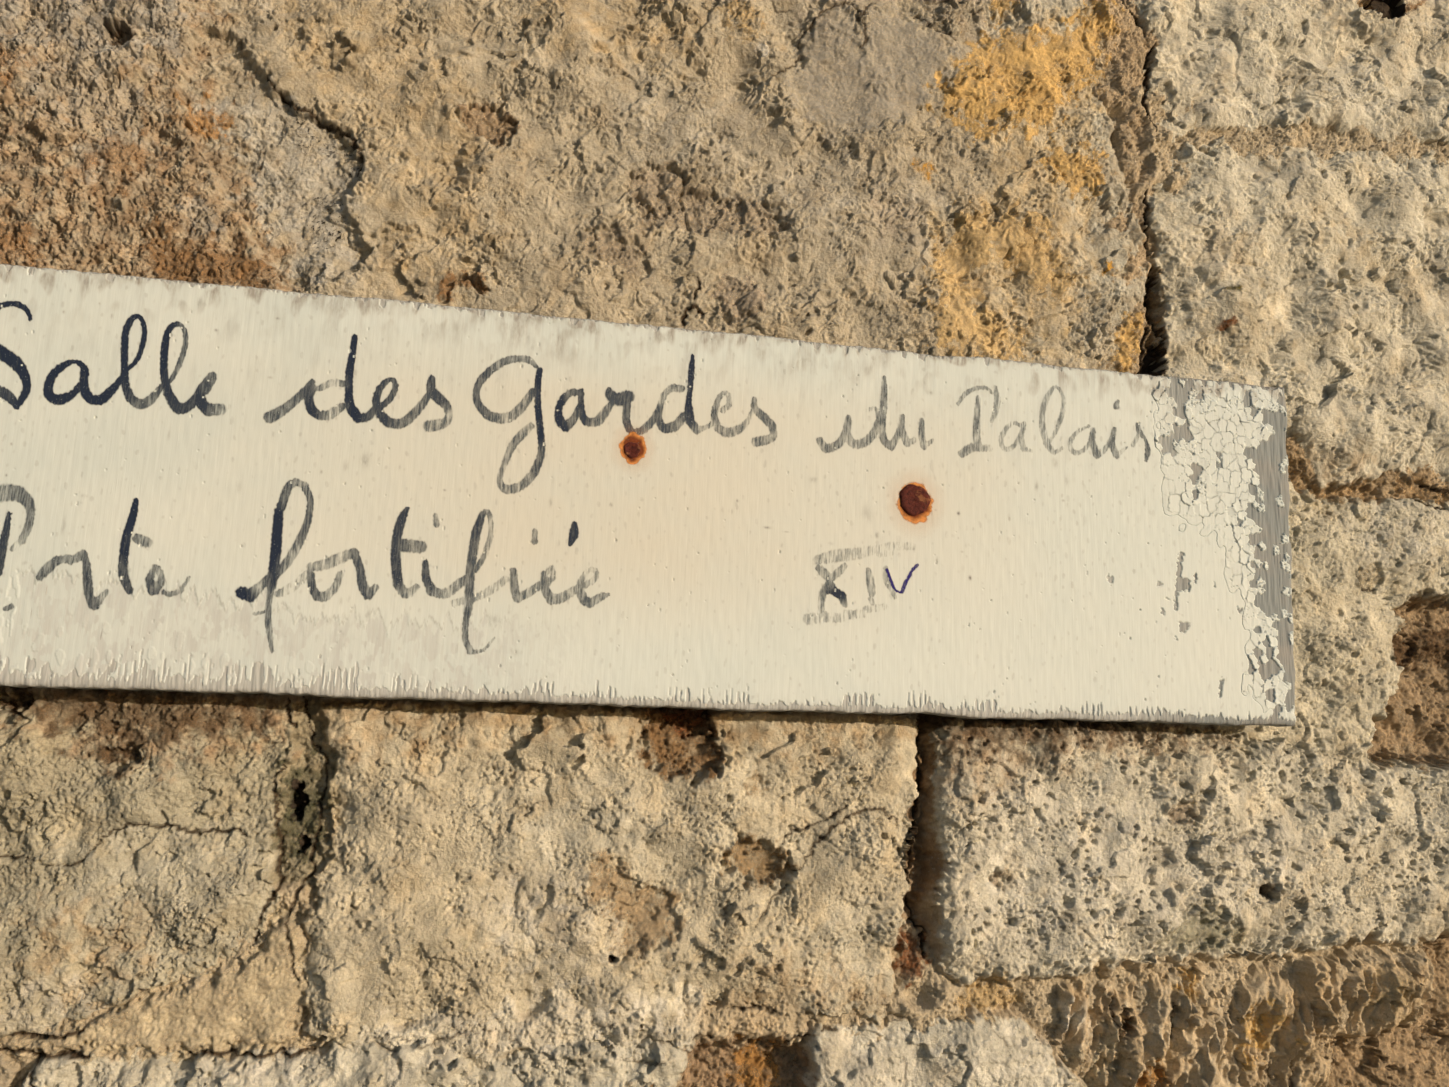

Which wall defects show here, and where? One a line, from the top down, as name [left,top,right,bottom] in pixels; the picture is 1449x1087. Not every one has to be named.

crack [267,77,364,175]
crack [1122,2,1156,128]
crack [1138,190,1167,372]
spalling [1367,594,1449,771]
crack [0,696,329,980]
crack [755,718,926,958]
crack [0,1027,90,1087]
crack [189,1046,316,1059]